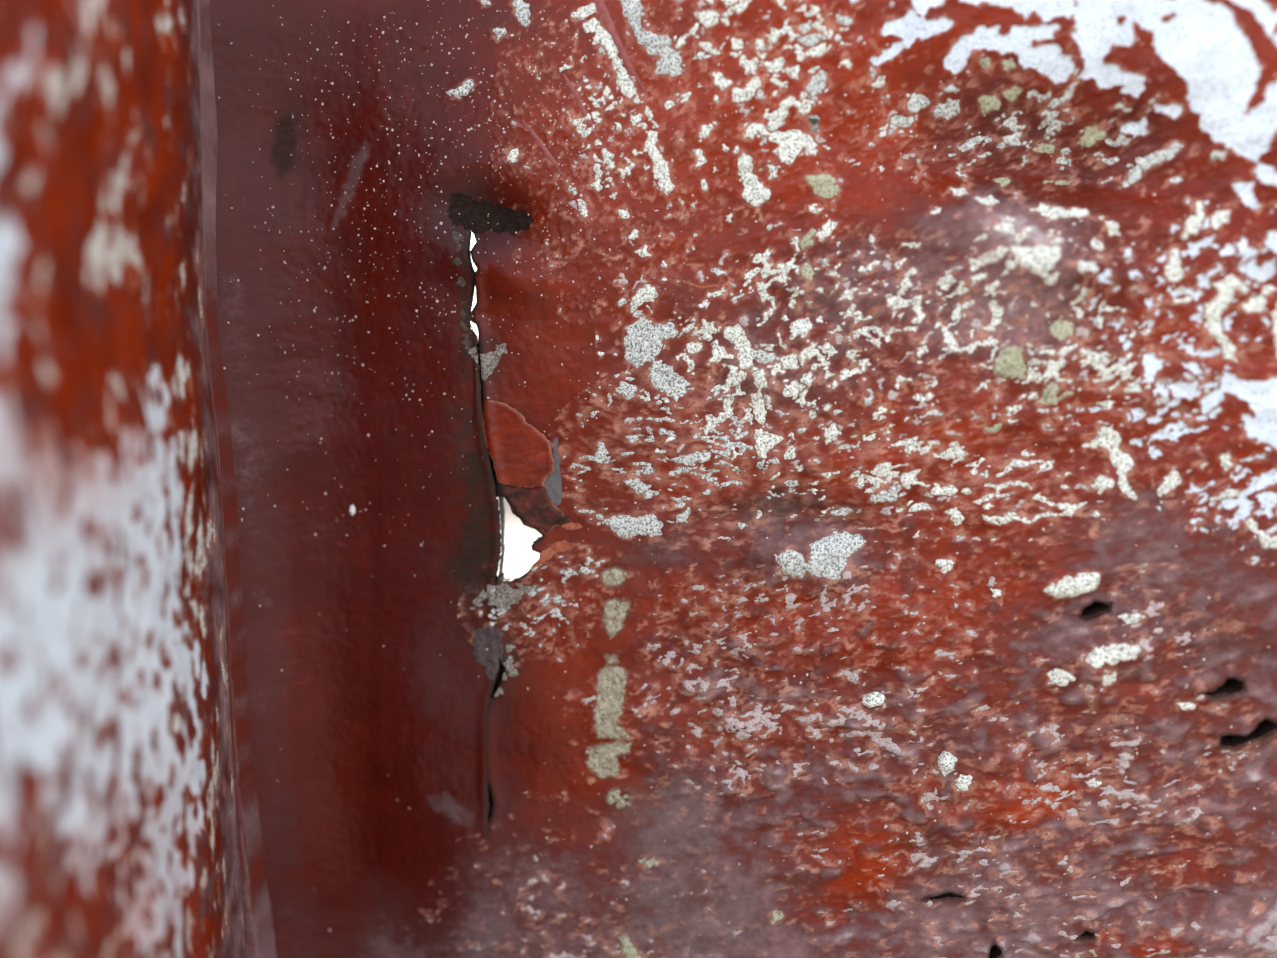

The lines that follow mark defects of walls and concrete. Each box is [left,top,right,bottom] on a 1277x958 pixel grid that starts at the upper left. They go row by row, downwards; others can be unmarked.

crack [468,229,483,412]
peeling [446,0,1277,813]
crack [489,455,502,497]
crack [491,659,504,699]
peeling [972,704,1222,841]
crack [486,783,494,823]
peeling [787,830,842,875]
peeling [878,824,1035,928]
peeling [519,855,665,958]
spalling [989,941,1024,958]
peeling [1043,915,1121,958]
peeling [1146,922,1201,957]